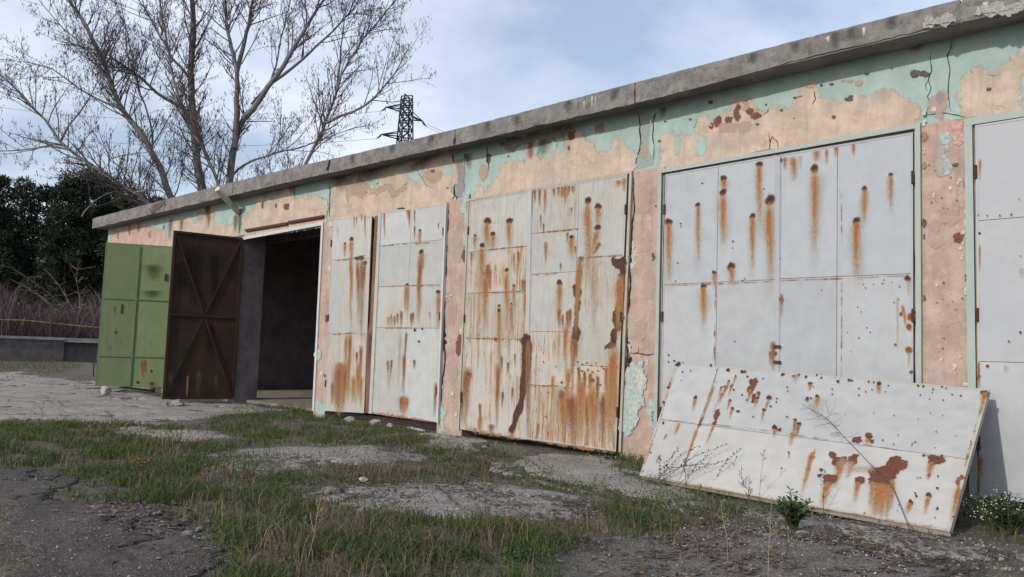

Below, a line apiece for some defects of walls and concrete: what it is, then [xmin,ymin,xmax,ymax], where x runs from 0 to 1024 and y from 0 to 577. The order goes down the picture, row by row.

crack [925,38,964,117]
corrosion [331,210,440,406]
corrosion [368,384,437,422]
corrosion [461,185,627,453]
peeling [109,47,1024,262]
peeling [618,338,654,436]
crack [625,88,656,370]
corrosion [675,262,749,319]
corrosion [749,161,775,263]
corrosion [642,327,982,530]
corrosion [810,147,837,232]
corrosion [841,185,915,330]